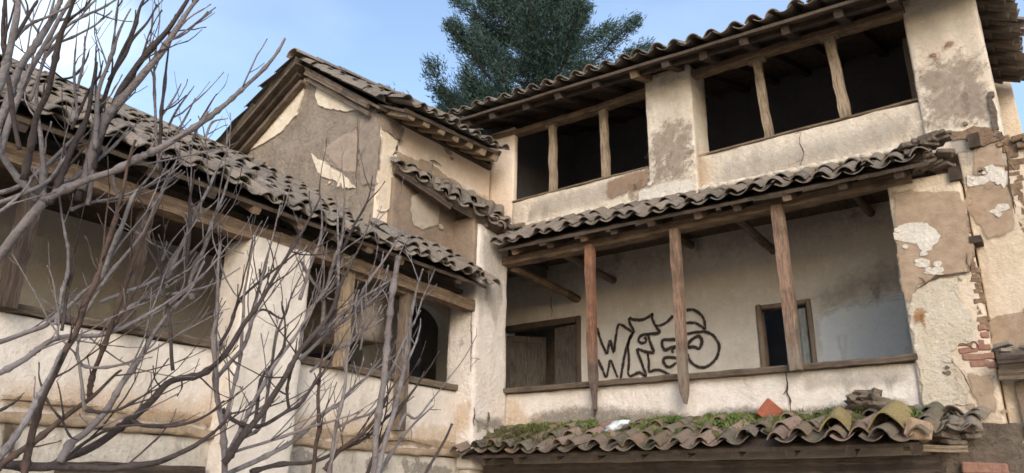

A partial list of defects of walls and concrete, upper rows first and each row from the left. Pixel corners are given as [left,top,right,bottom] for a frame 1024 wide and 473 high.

spalling [246,78,403,212]
peeling [410,192,444,229]
rust [914,309,926,325]
spalling [893,213,997,406]
crack [783,372,791,410]